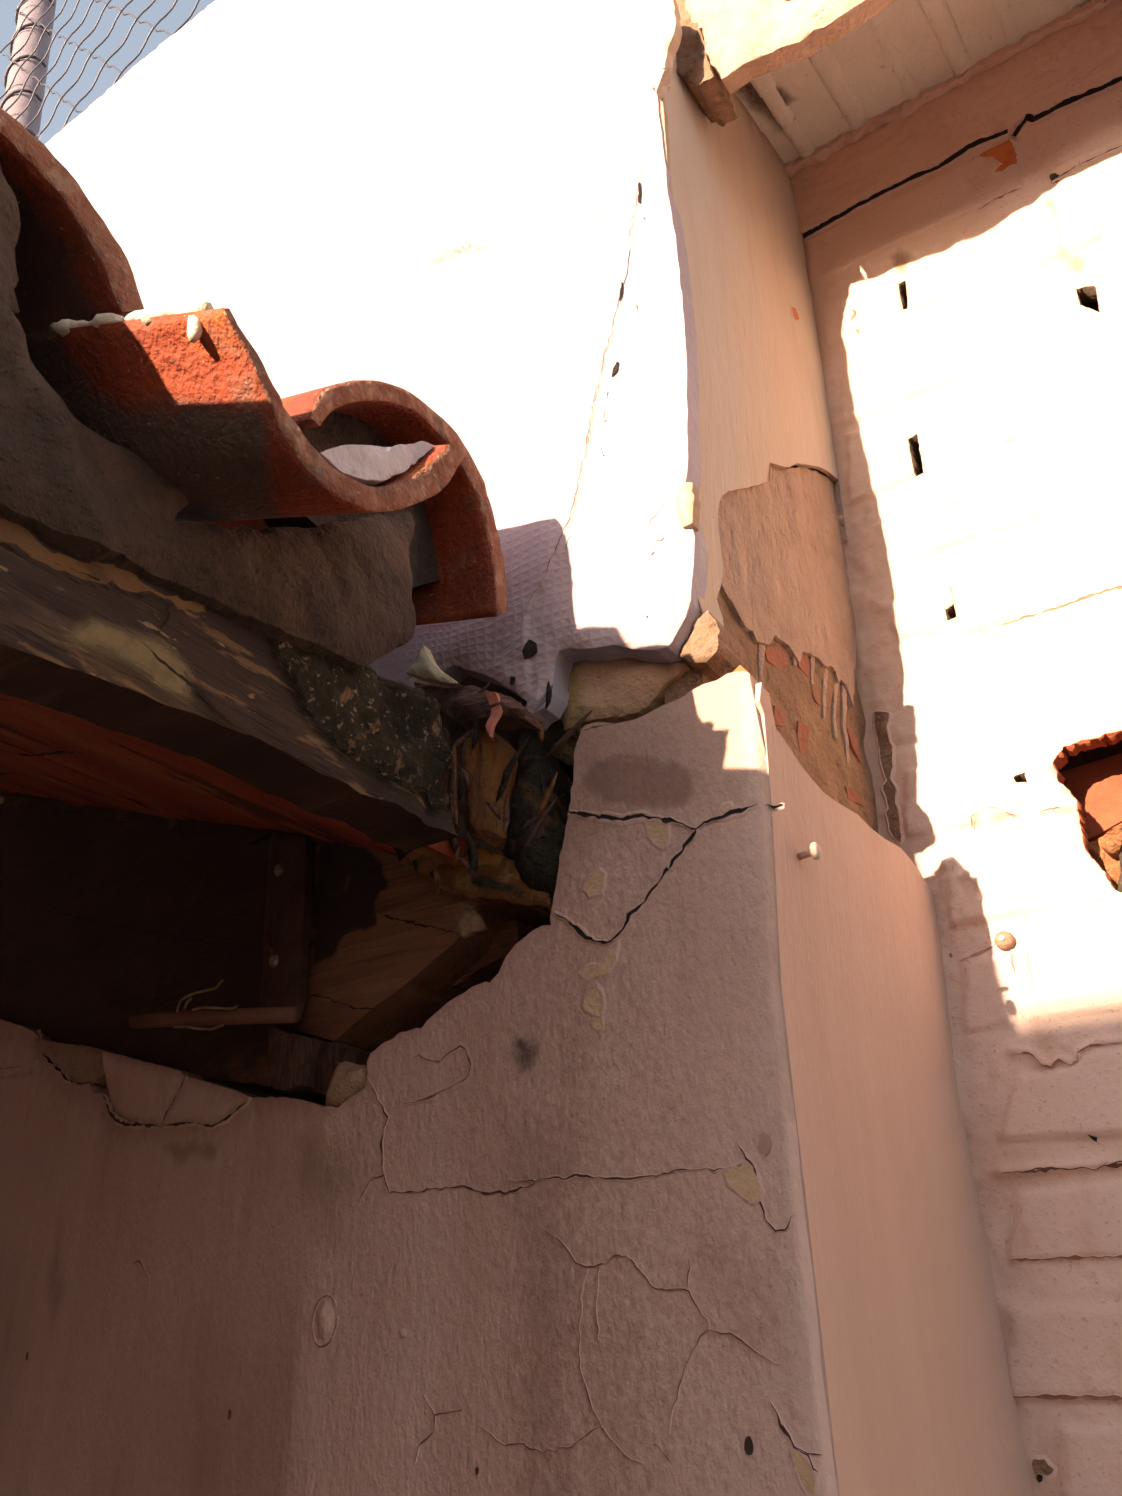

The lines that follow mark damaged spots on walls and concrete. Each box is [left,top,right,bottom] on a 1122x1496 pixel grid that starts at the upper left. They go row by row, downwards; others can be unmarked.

spalling [405,646,465,688]
spalling [676,466,905,846]
peeling [642,820,672,852]
crack [552,802,785,946]
spalling [1060,753,1122,843]
crack [37,1029,252,1130]
peeling [34,1038,259,1128]
crack [359,1042,797,1233]
crack [415,1227,781,1464]
crack [769,1400,823,1473]